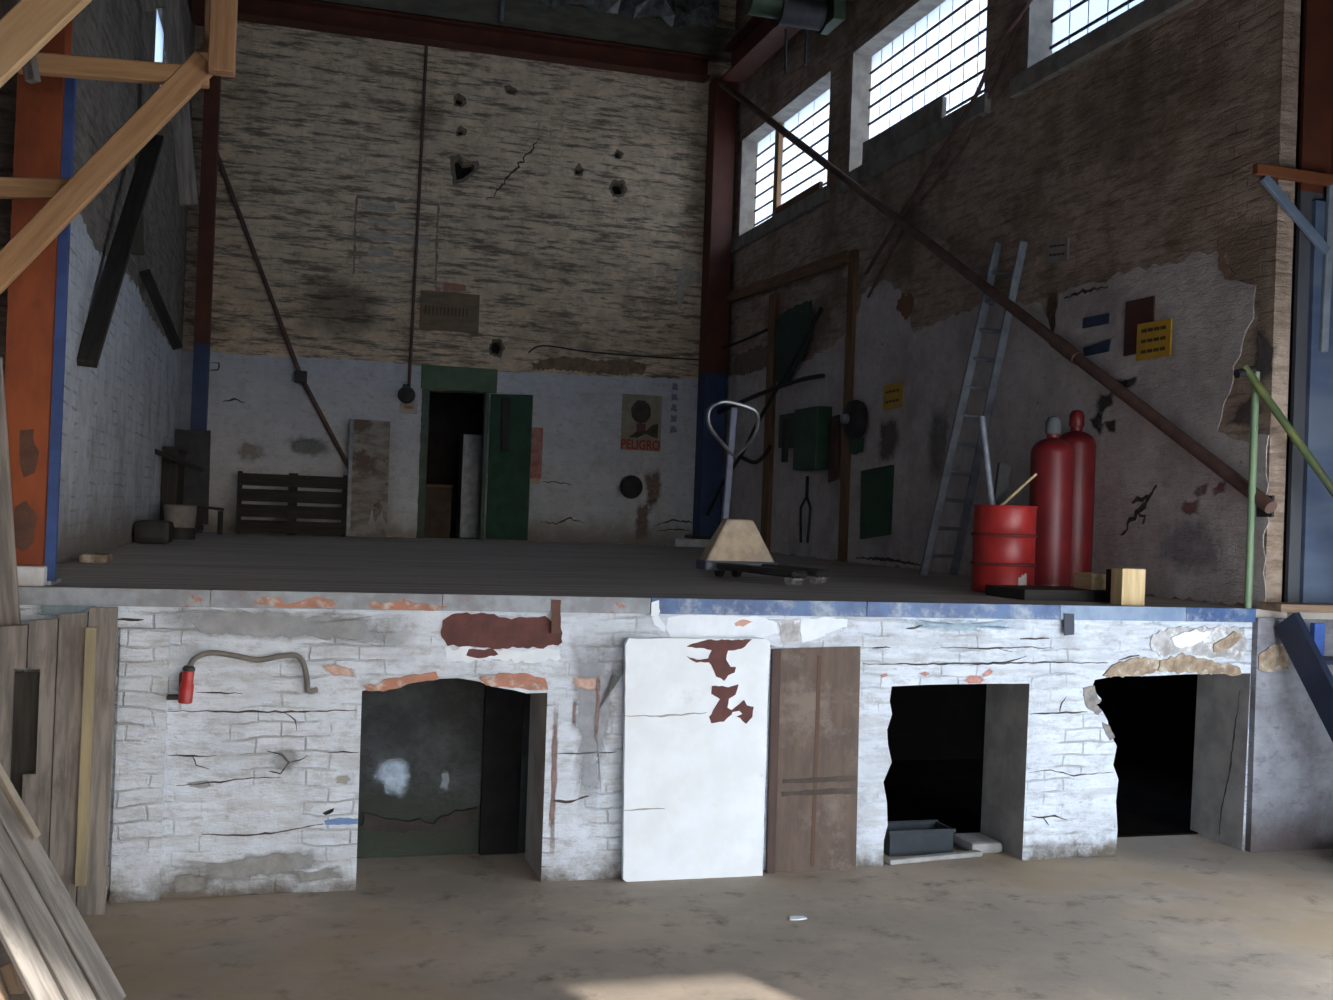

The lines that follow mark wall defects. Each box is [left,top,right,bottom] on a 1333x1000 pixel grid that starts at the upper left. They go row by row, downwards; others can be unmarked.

spalling [450,154,479,185]
crack [486,136,542,200]
peeling [1255,332,1275,380]
peeling [1232,397,1251,425]
crack [1120,485,1157,536]
peeling [441,612,562,658]
spalling [363,671,438,691]
spalling [478,673,548,691]
spalling [1083,625,1288,740]
crack [168,692,359,786]
crack [202,824,322,836]
damp [173,852,341,893]